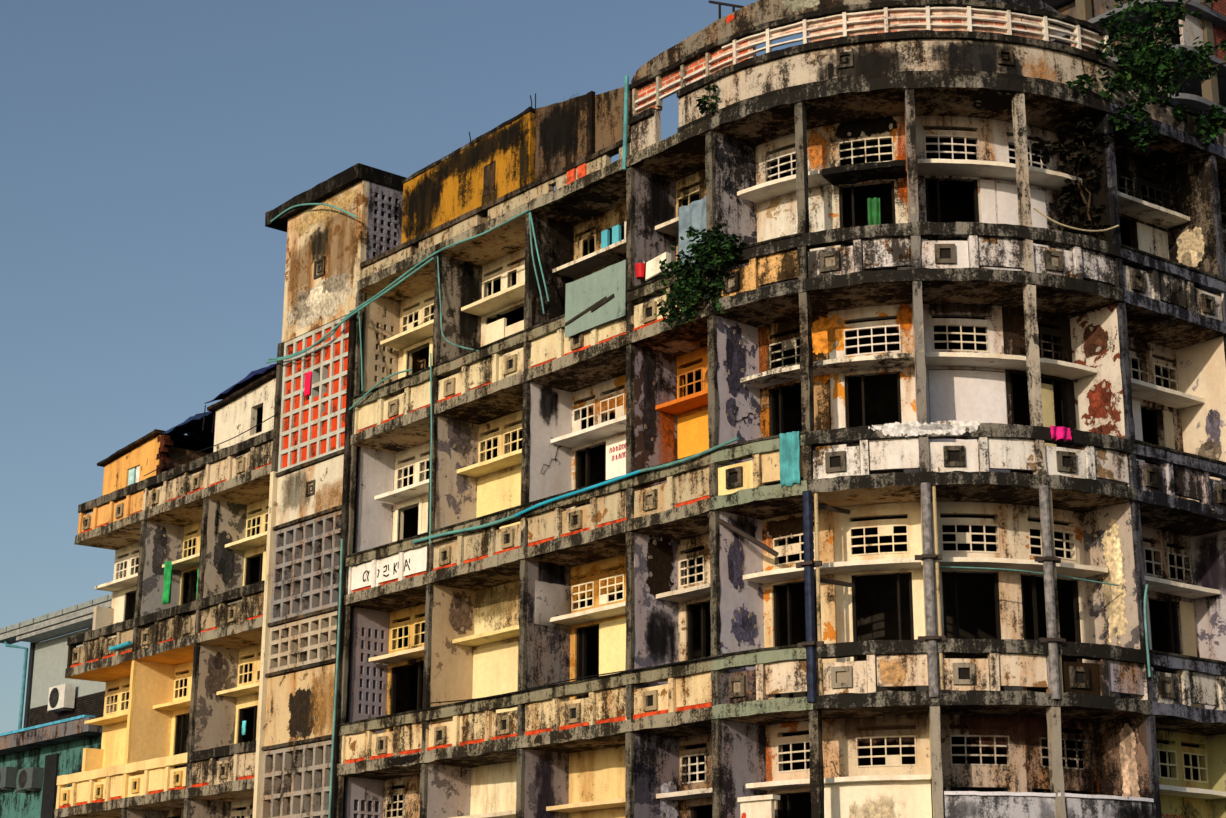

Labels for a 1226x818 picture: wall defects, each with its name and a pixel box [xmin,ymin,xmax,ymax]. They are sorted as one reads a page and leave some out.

water stain [402,97,579,248]
water stain [290,189,356,311]
peeling [1176,226,1205,267]
peeling [811,312,847,355]
water stain [646,610,676,661]